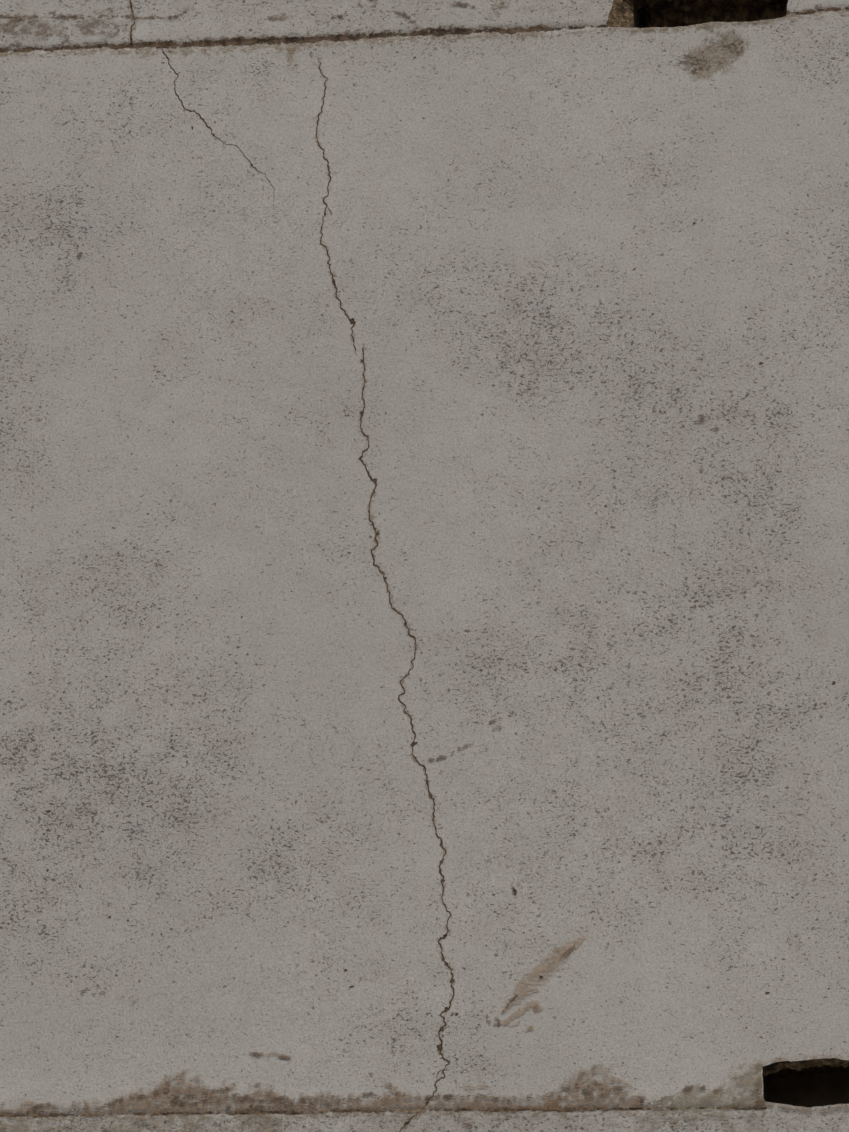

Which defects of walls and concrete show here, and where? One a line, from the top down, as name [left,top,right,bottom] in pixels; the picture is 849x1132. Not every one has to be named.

crack [0,0,188,43]
spalling [606,0,849,79]
crack [162,50,275,207]
crack [315,59,458,1132]
spalling [762,1058,849,1108]